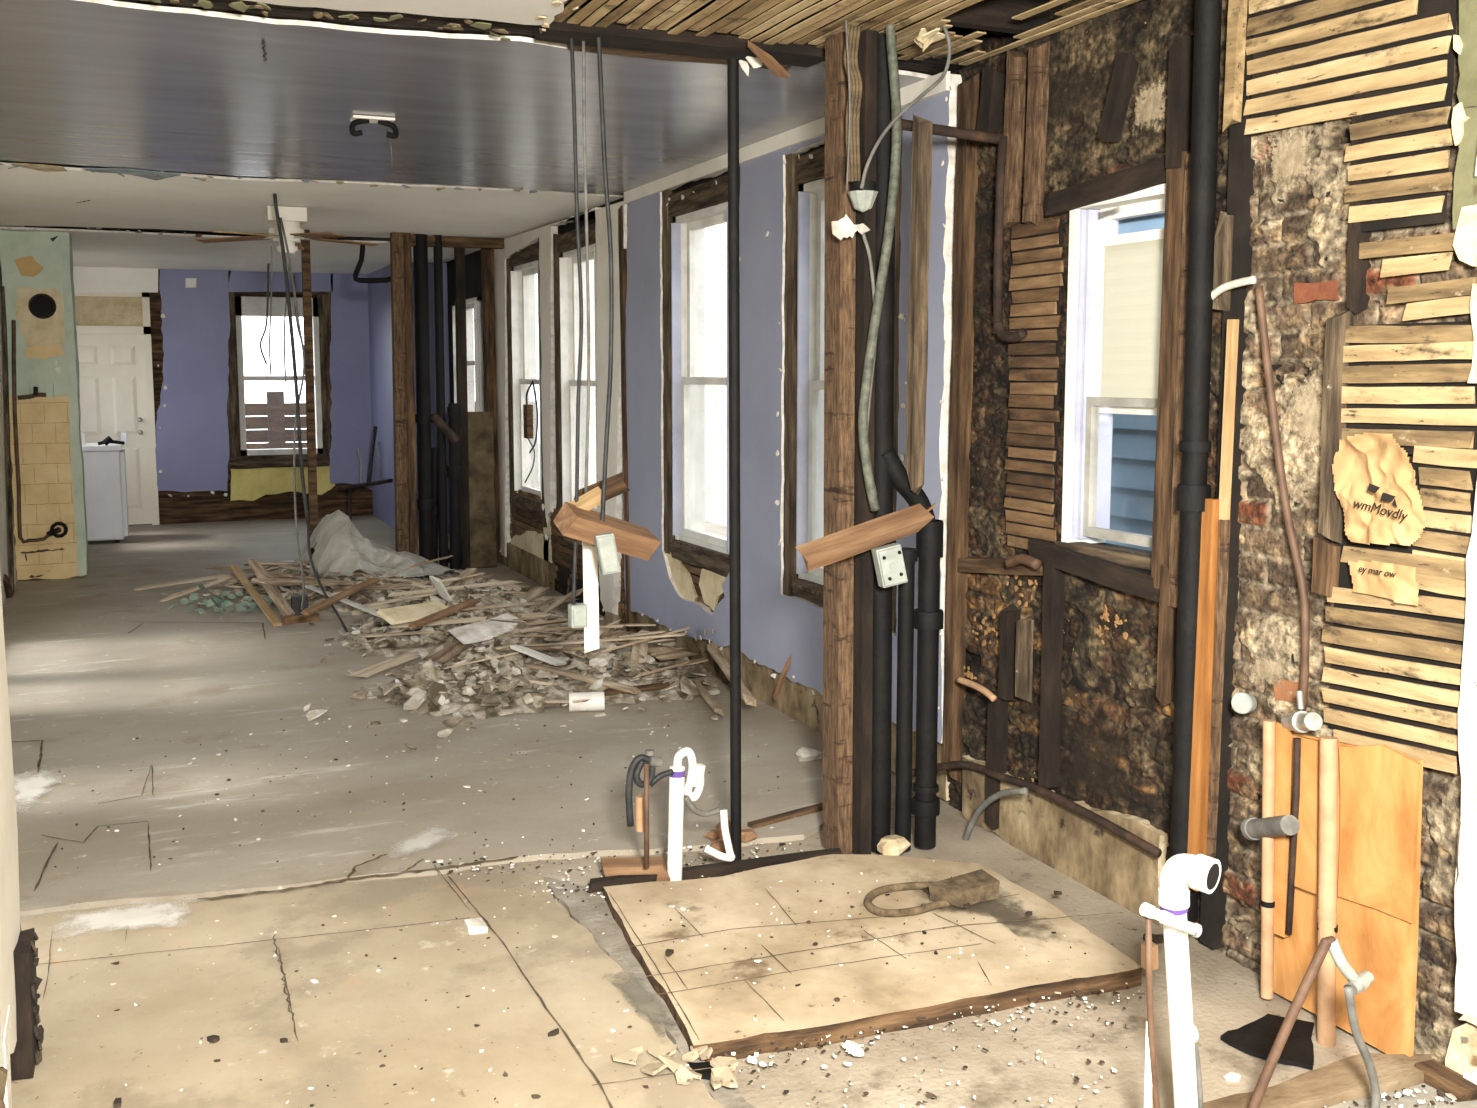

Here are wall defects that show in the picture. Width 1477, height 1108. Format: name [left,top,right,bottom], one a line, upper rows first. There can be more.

flaking render [140,0,271,17]
flaking render [313,11,511,41]
flaking render [535,0,579,33]
flaking render [914,0,1195,862]
flaking render [1207,309,1223,499]
flaking render [1215,0,1477,975]
flaking render [1189,891,1201,941]
flaking render [1413,765,1477,1085]
flaking render [0,1005,12,1108]